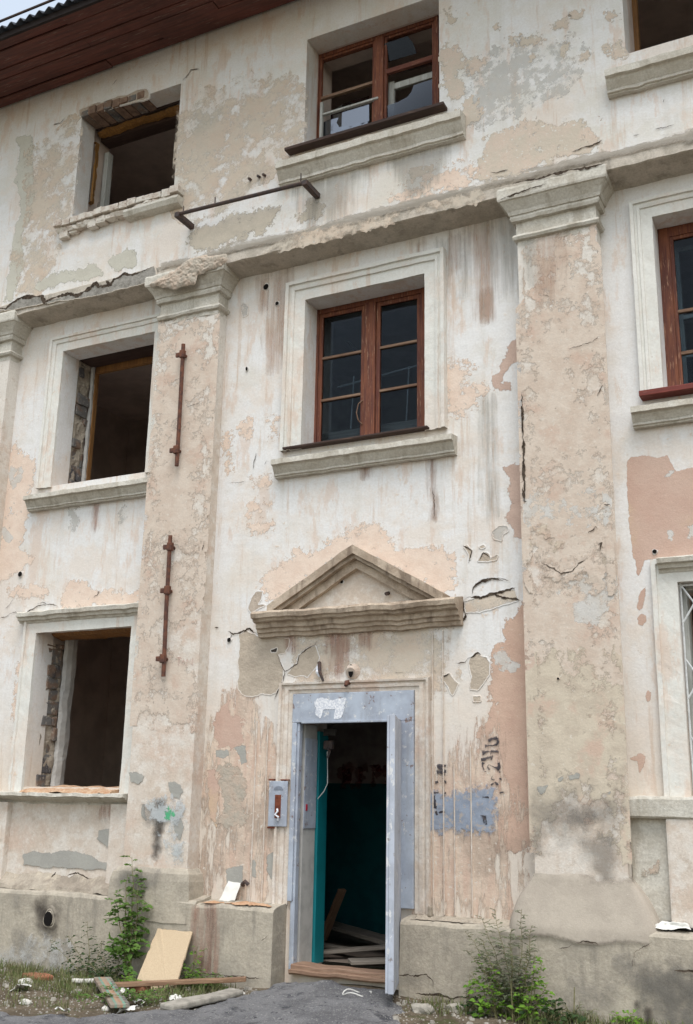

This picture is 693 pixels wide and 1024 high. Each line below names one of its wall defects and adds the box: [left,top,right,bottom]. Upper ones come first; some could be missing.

peeling [493,9,629,65]
peeling [438,42,494,127]
peeling [0,73,604,313]
crack [492,141,602,199]
crack [0,267,151,309]
crack [520,393,528,502]
peeling [0,224,646,920]
crack [463,546,521,621]
crack [544,504,610,574]
peeling [626,455,693,575]
water stain [153,821,163,855]
water stain [2,903,72,965]